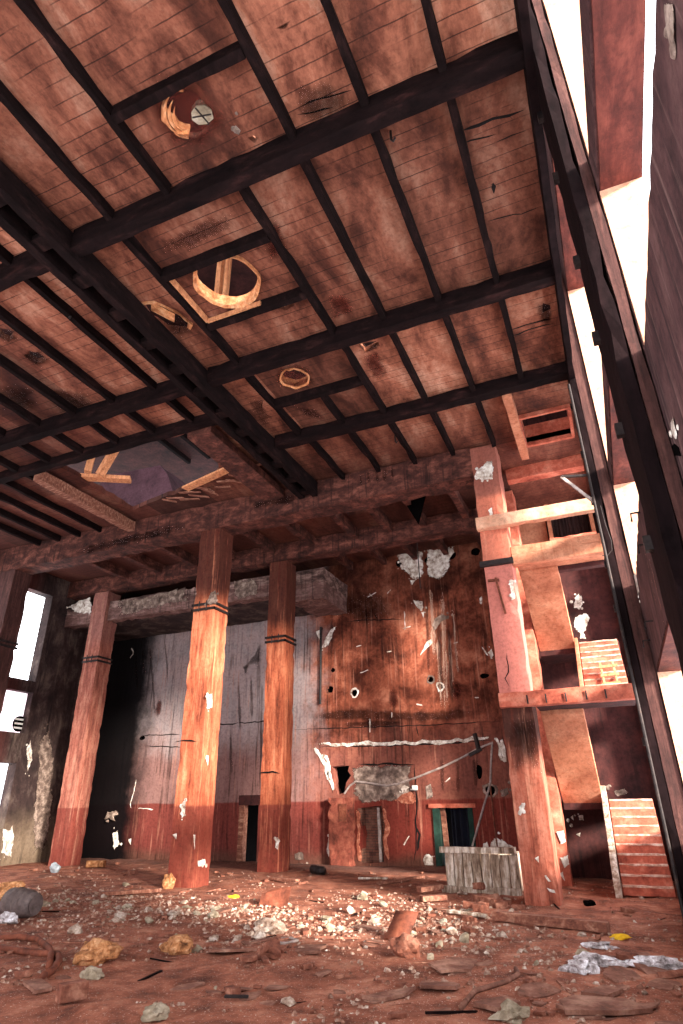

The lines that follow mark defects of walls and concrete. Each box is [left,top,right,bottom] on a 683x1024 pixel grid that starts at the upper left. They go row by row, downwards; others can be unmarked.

crack [297,90,351,115]
crack [464,110,524,142]
peeling [474,461,494,482]
peeling [396,547,456,584]
spalling [66,597,92,614]
peeling [570,594,589,639]
flaking render [314,736,507,790]
flaking render [352,765,433,861]